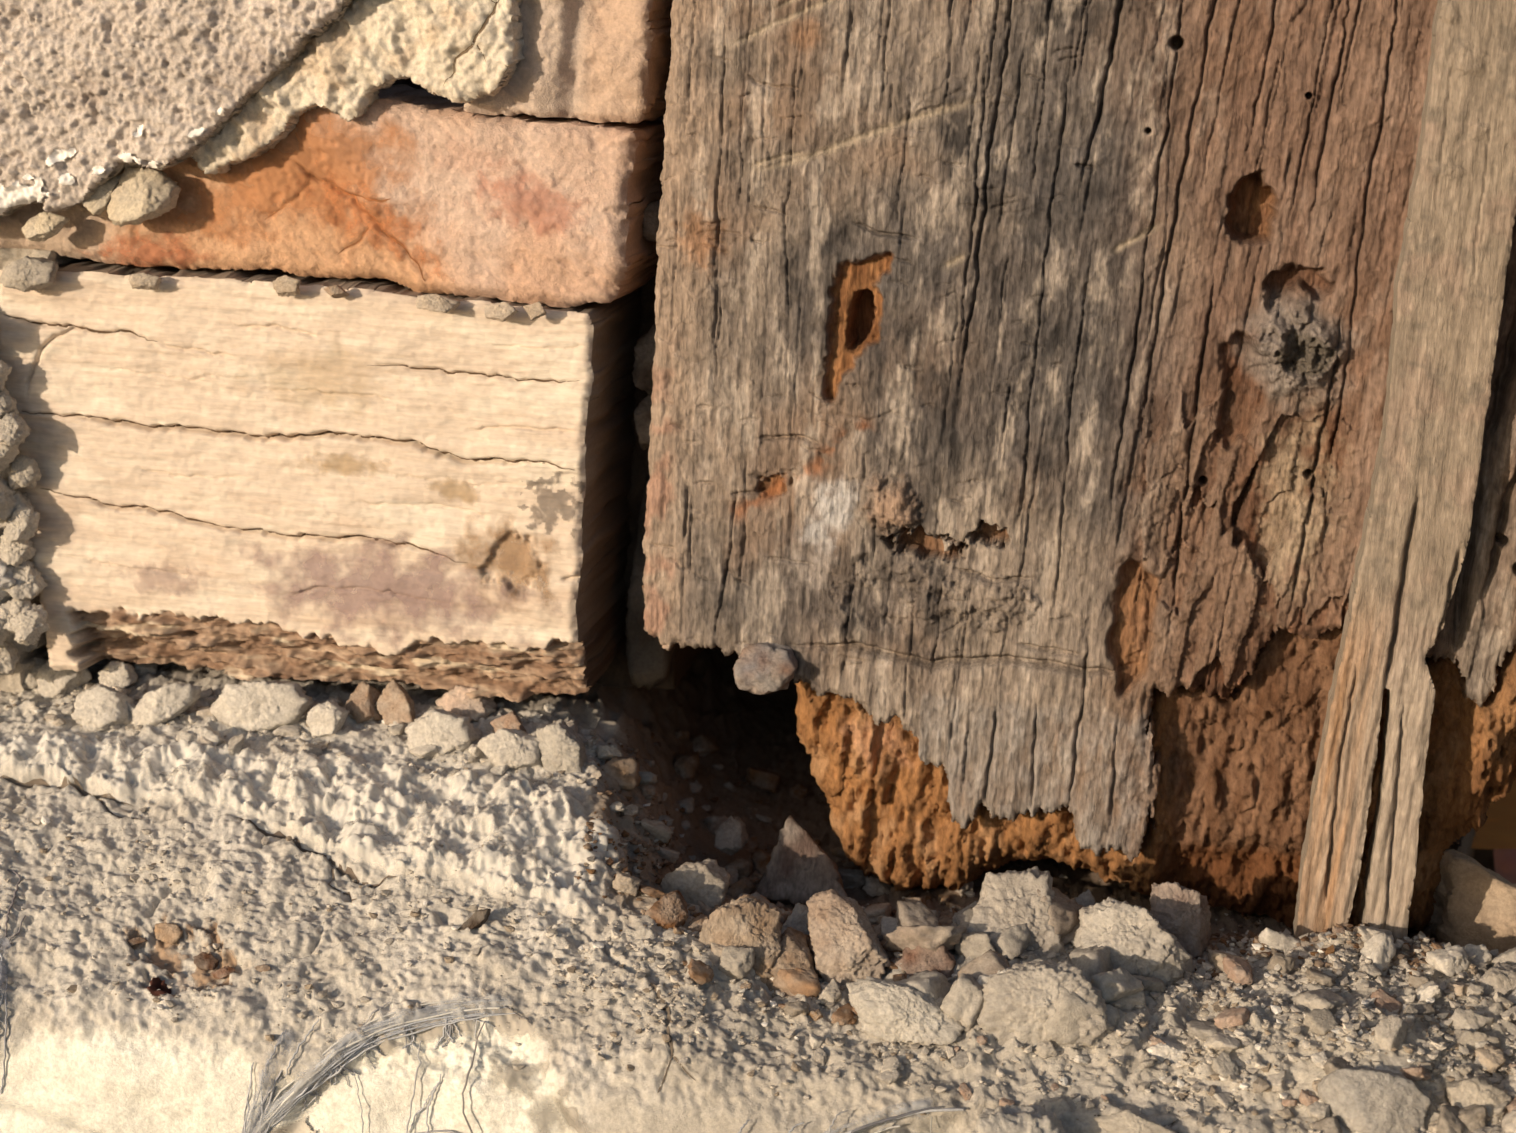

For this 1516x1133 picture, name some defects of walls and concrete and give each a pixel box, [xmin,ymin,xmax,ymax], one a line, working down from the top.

spalling [187,0,525,174]
spalling [0,124,181,242]
crack [264,159,425,281]
crack [4,314,157,342]
crack [368,365,580,383]
crack [23,411,575,471]
crack [41,488,468,563]
crack [0,775,139,819]
crack [236,817,396,902]